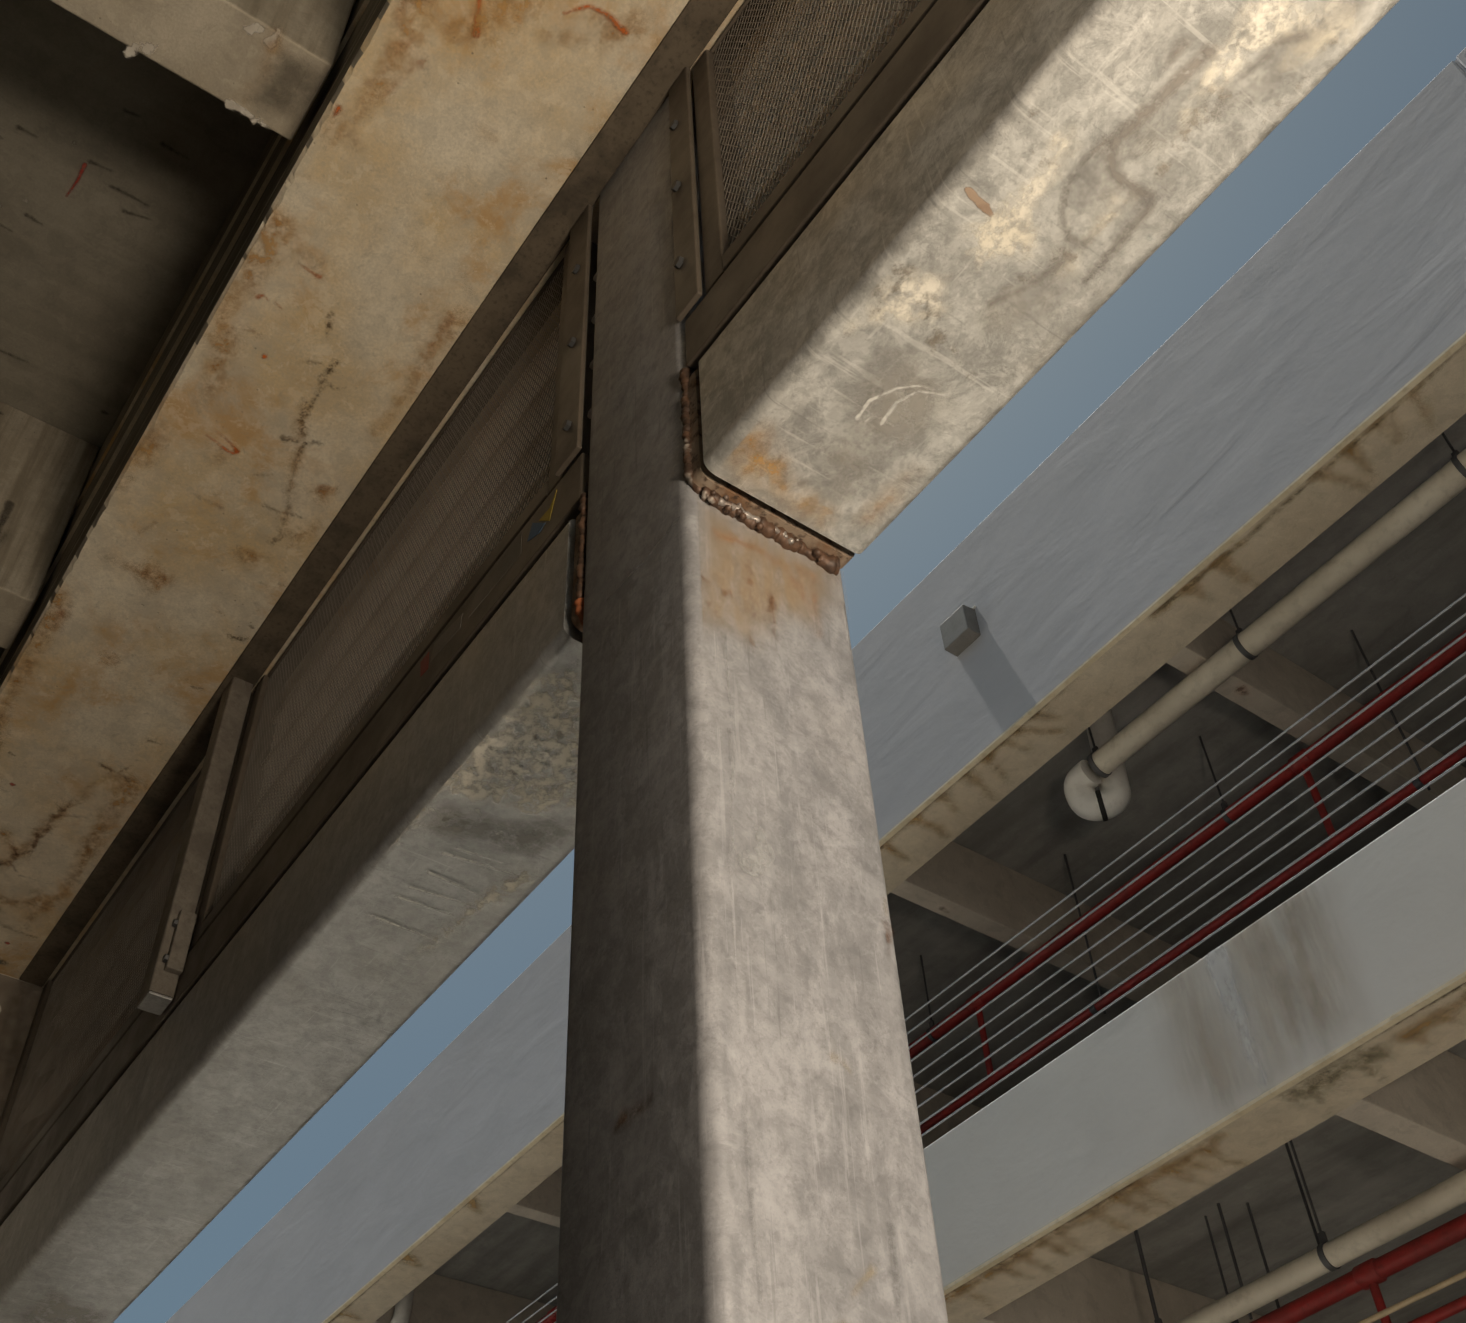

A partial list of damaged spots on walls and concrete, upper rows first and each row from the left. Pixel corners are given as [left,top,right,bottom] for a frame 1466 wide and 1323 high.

corrosion [578,5,628,36]
leakage [1015,45,1215,300]